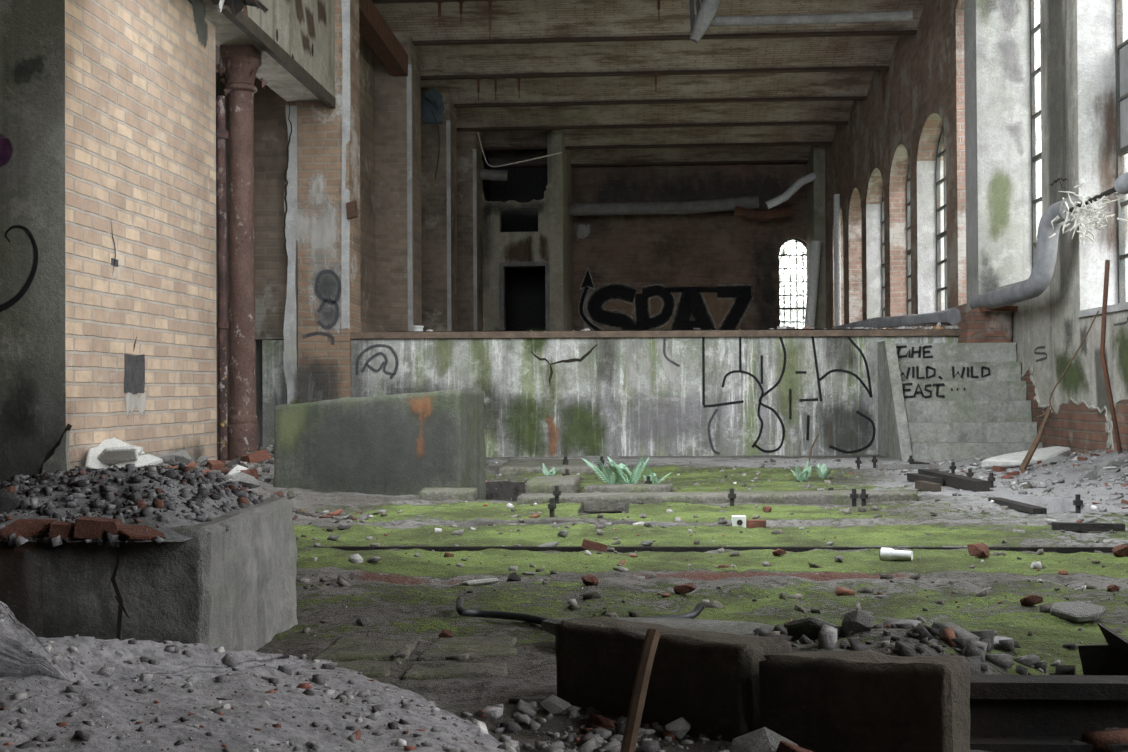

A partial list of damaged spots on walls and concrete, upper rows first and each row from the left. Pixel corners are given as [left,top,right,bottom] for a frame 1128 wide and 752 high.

spalling [1021,362,1128,454]